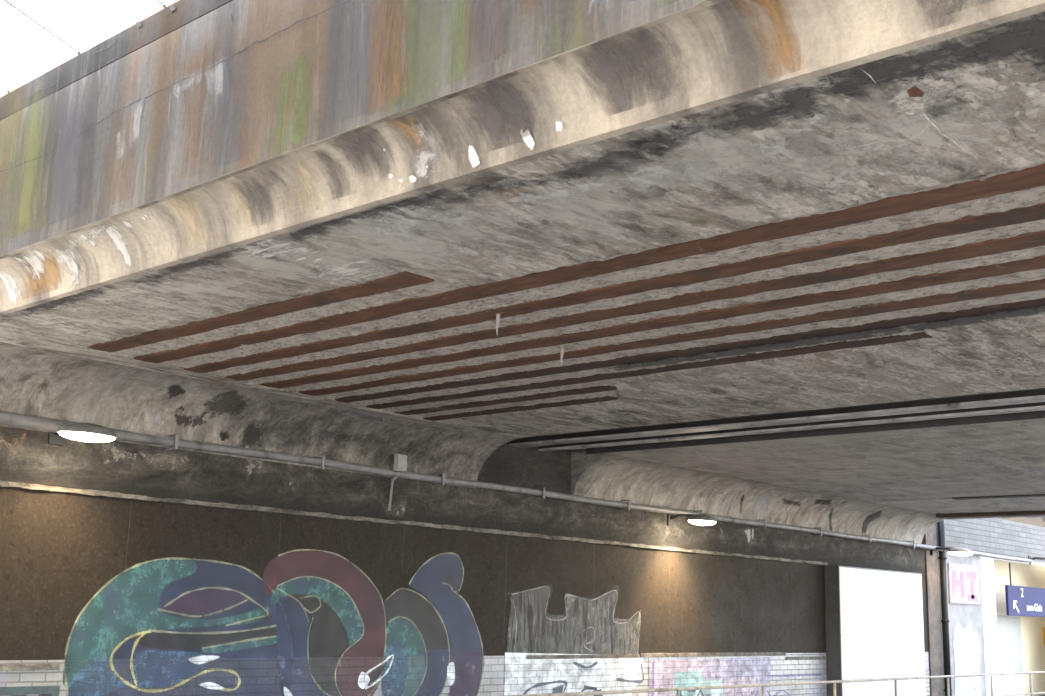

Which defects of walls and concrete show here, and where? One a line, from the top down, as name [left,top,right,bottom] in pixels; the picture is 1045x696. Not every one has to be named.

rust [753,0,794,69]
peeling [888,77,964,119]
peeling [468,145,480,167]
damp [0,13,1045,339]
peeling [520,129,535,150]
spalling [772,163,1045,223]
rust [26,256,60,296]
spalling [86,186,1045,421]
damp [612,305,1045,370]
spalling [168,385,245,428]
peeling [103,443,191,470]
spalling [242,424,265,476]